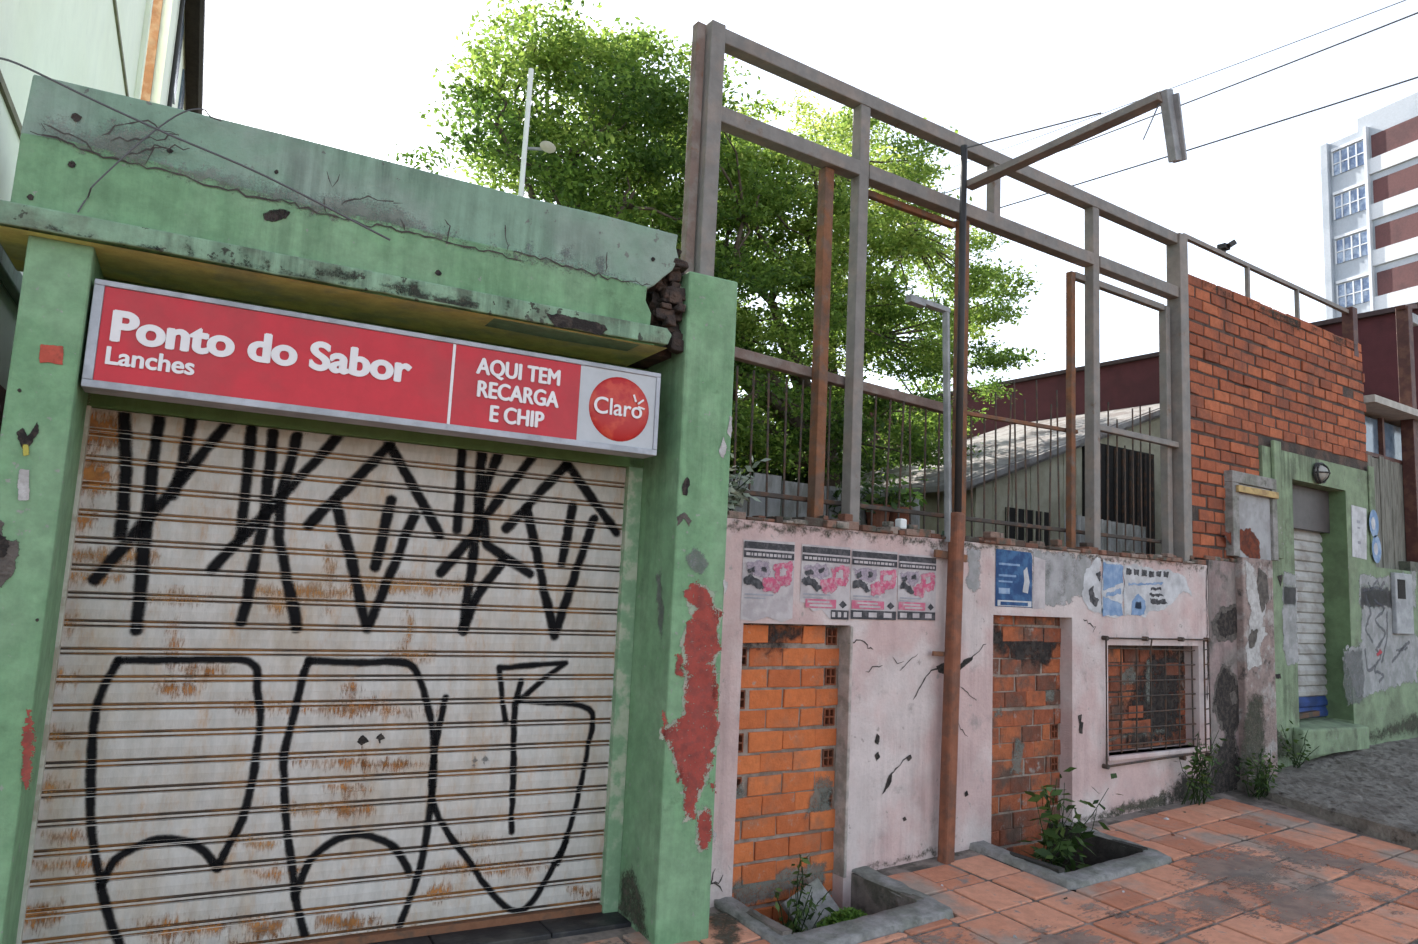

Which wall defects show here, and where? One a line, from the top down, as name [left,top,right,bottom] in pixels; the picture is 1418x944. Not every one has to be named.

crack [30,120,650,286]
spalling [647,249,689,354]
corrosion [77,412,119,530]
peeling [719,416,732,458]
flaking render [0,520,20,587]
corrosion [283,752,420,816]
peeling [659,580,728,853]
crack [853,639,976,737]
leakage [1235,694,1293,790]
leakage [1369,714,1418,742]
corrosion [427,839,541,903]
corrosion [138,908,428,944]